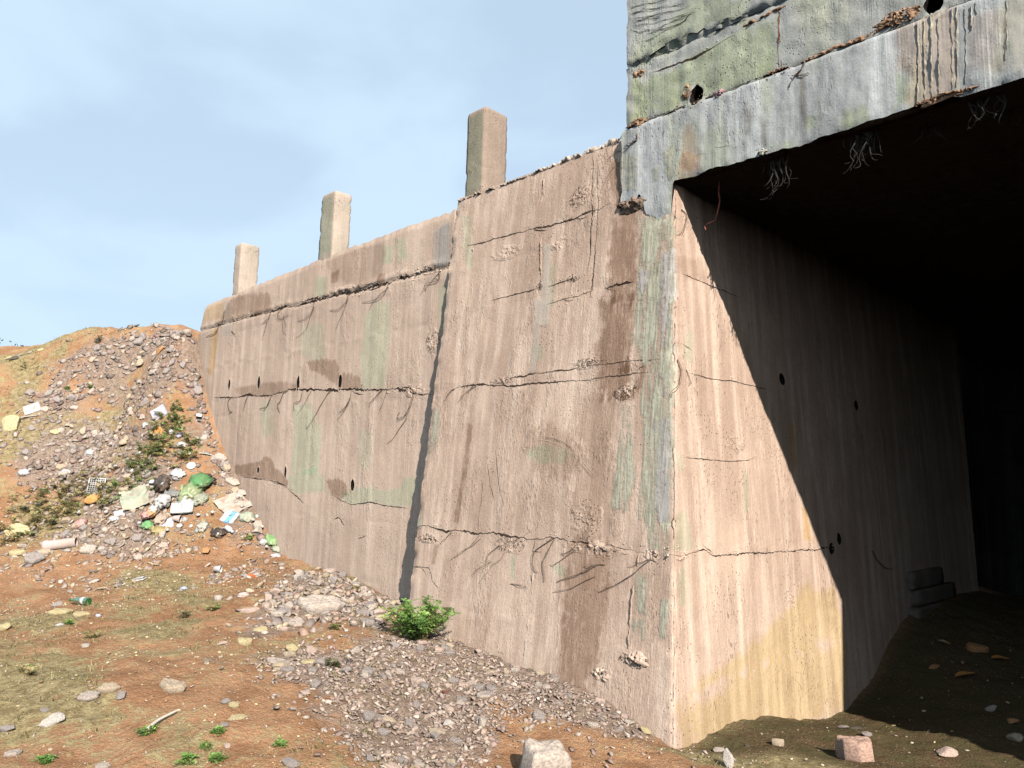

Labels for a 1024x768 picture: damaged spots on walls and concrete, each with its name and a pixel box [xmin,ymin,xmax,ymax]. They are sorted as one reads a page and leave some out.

crack [202,153,635,333]
crack [213,339,768,399]
damp [631,248,678,556]
crack [330,457,837,562]